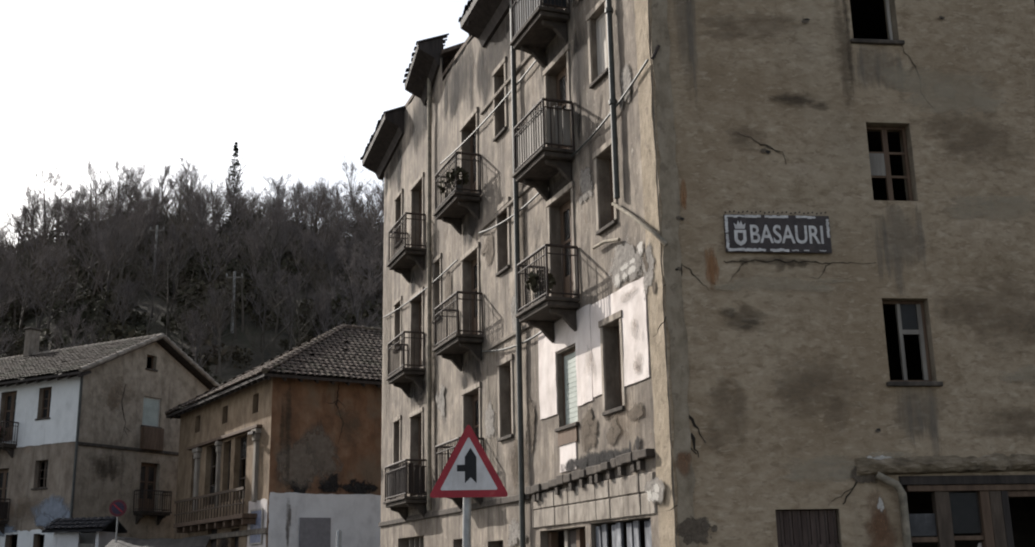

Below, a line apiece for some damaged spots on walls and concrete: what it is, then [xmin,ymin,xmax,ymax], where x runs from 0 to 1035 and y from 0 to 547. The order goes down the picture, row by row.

crack [737,133,786,162]
flaking render [609,236,656,301]
crack [662,259,876,290]
crack [689,415,706,457]
spalling [676,517,717,545]